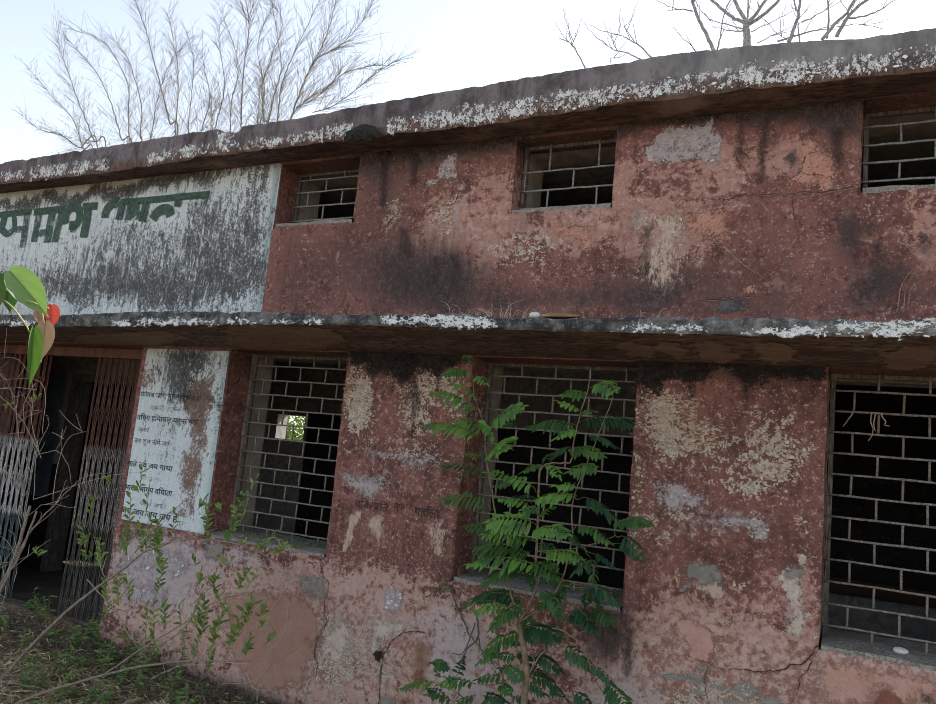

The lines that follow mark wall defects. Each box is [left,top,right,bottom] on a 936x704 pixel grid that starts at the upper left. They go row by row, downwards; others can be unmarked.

peeling [145,44,936,168]
peeling [642,200,737,293]
crack [680,152,854,261]
peeling [791,140,841,191]
peeling [340,365,367,419]
peeling [628,380,733,508]
peeling [742,417,830,496]
flaking render [776,554,808,637]
spalling [656,617,783,704]
crack [679,645,819,704]
peeling [820,659,936,704]